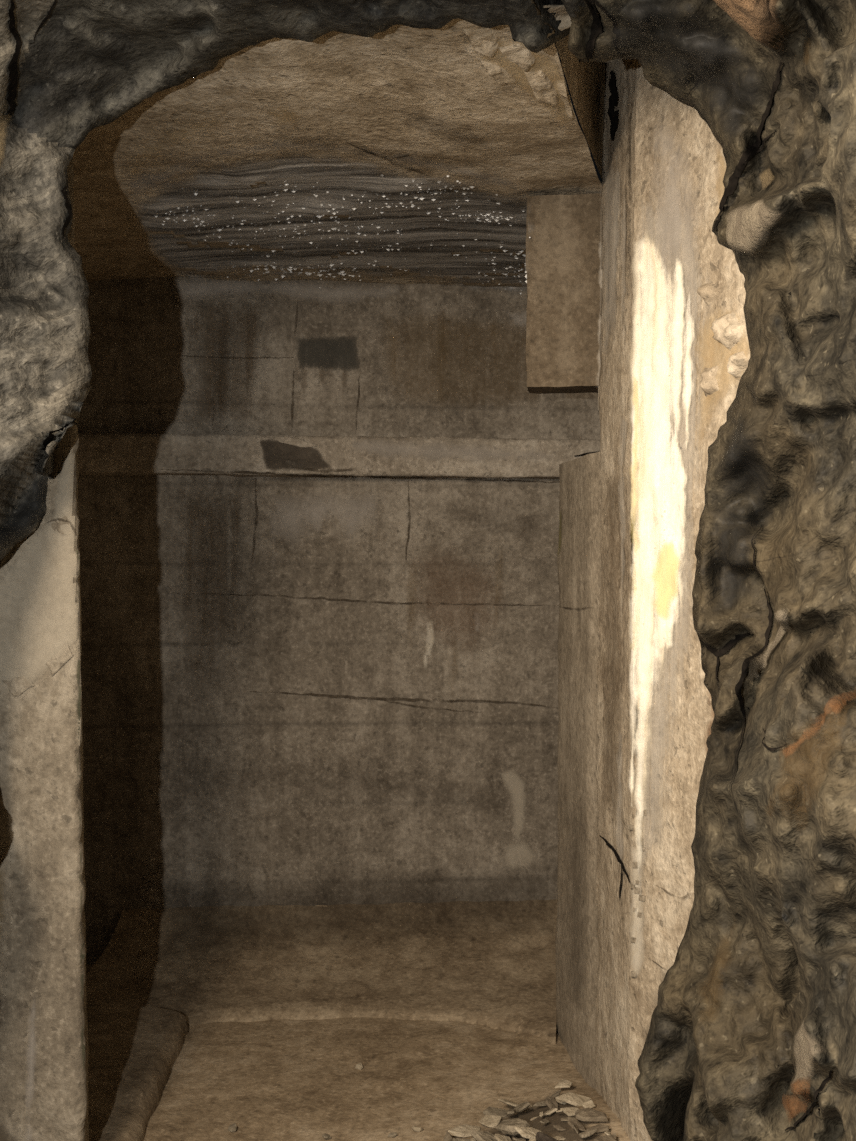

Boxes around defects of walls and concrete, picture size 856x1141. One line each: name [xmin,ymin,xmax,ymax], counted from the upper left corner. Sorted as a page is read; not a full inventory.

leakage [132,158,531,299]
leakage [599,174,750,860]
crack [600,836,630,900]